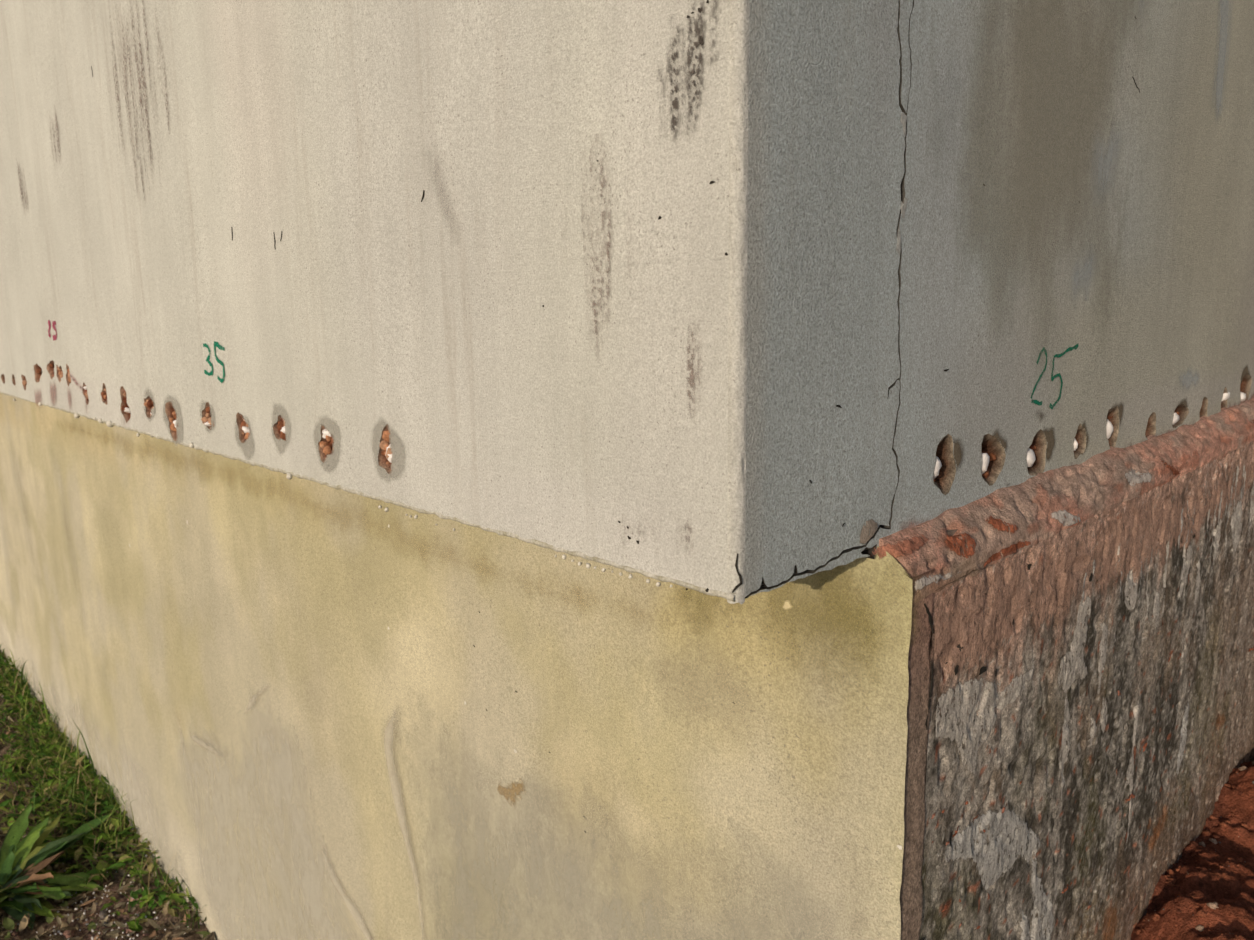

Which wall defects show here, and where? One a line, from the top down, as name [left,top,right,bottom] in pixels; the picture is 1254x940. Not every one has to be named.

water stain [114,10,160,152]
water stain [668,0,717,137]
crack [732,0,914,599]
water stain [82,729,150,848]